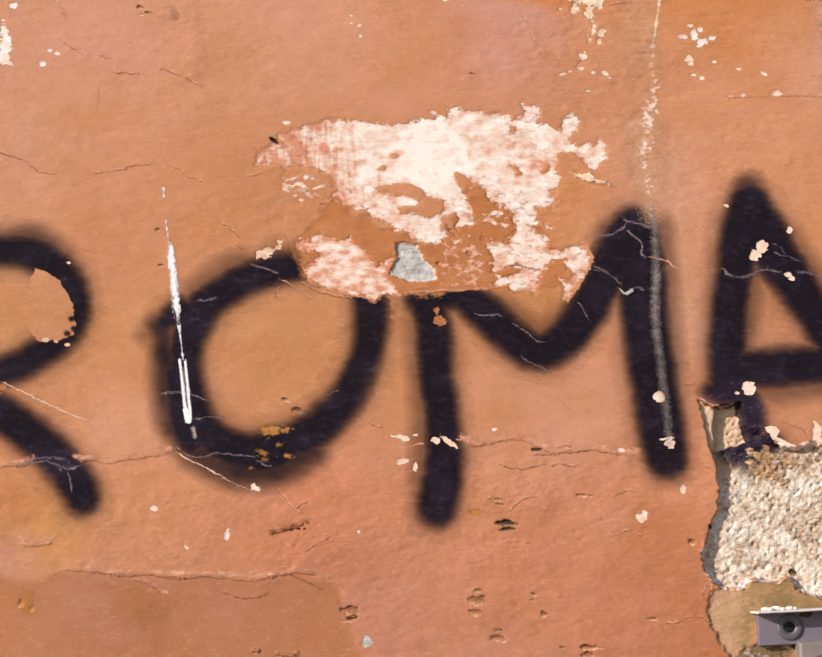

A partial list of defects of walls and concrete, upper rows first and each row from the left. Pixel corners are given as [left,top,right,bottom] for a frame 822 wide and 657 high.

peeling [0,19,14,66]
peeling [678,24,717,48]
peeling [255,103,612,326]
peeling [21,268,76,346]
crack [161,391,227,420]
peeling [734,381,756,395]
crack [21,456,78,492]
crack [174,446,271,467]
flaking render [699,401,822,657]